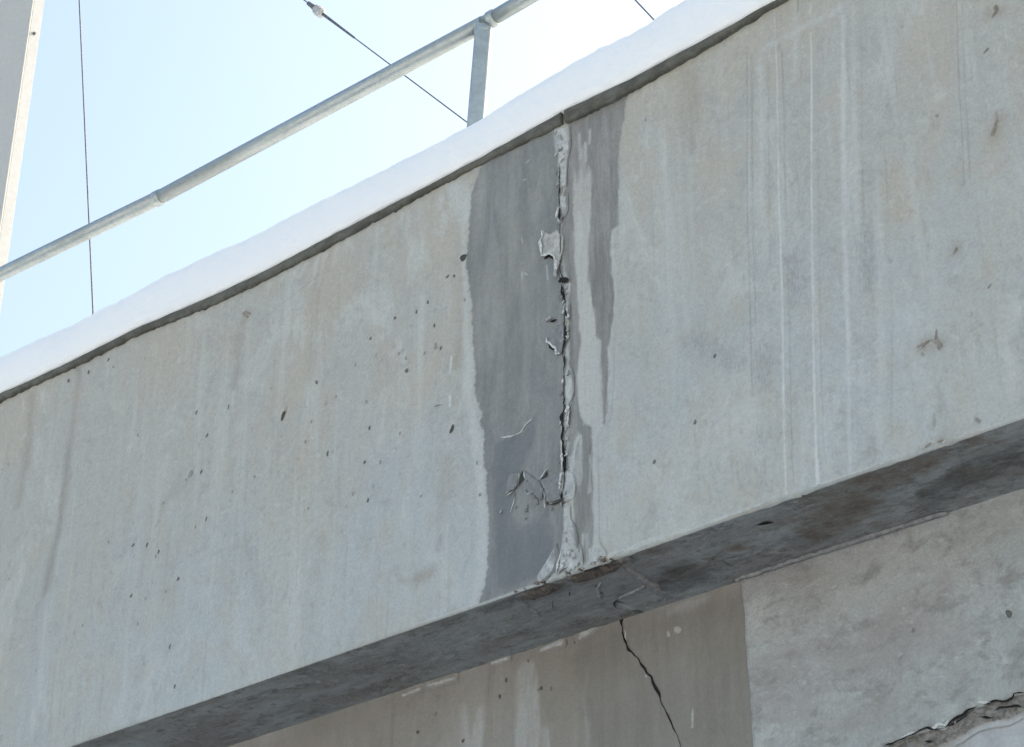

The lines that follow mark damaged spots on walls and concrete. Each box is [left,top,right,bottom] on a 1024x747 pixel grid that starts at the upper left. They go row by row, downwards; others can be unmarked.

damp [264,235,353,299]
damp [430,93,632,616]
peeling [545,316,565,355]
crack [558,147,569,507]
spalling [406,409,1024,628]
crack [595,586,681,747]
spalling [884,692,1024,747]